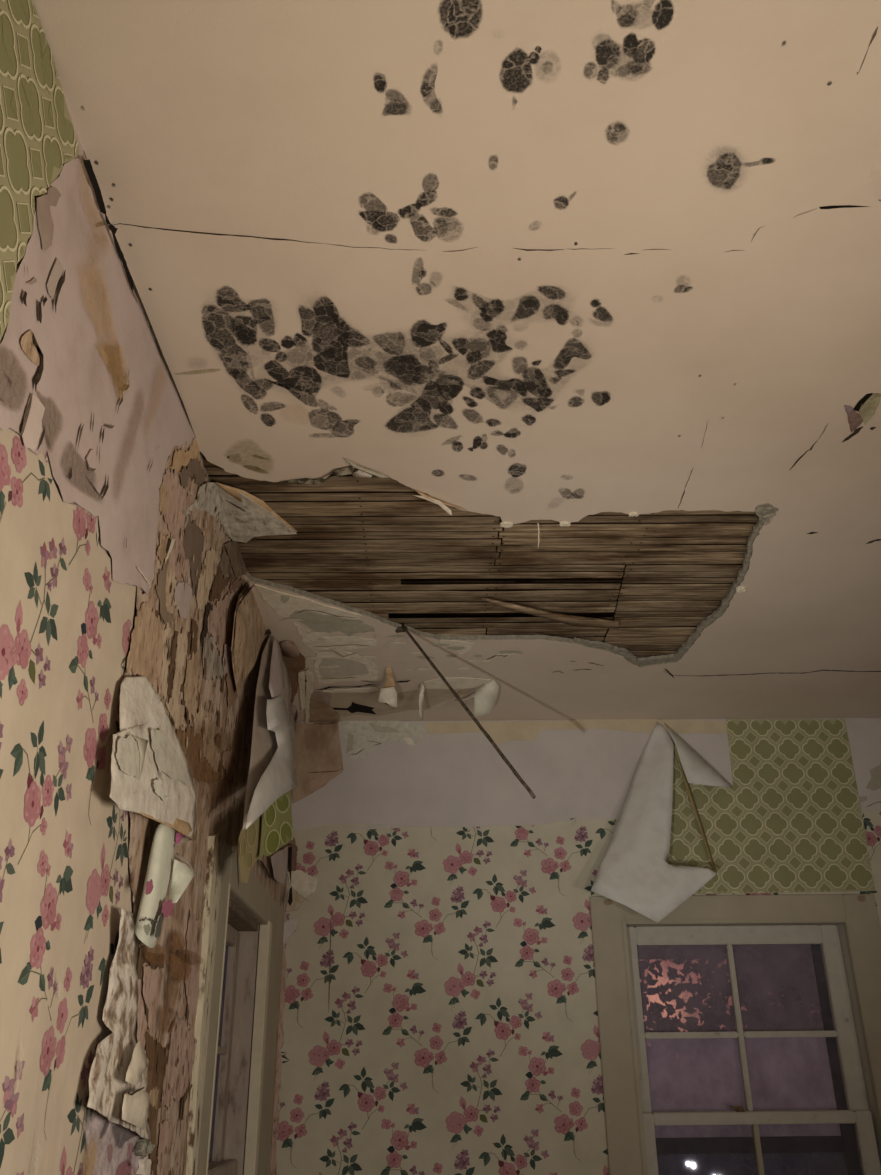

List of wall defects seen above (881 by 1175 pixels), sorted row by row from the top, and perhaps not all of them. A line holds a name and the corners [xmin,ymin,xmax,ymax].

water stain [501,47,541,104]
water stain [585,12,655,81]
crack [96,222,477,252]
water stain [360,176,456,243]
crack [514,247,669,255]
crack [795,205,870,217]
crack [0,267,129,500]
peeling [0,159,207,594]
water stain [194,286,591,477]
peeling [254,584,652,831]
peeling [668,719,733,786]
peeling [85,830,219,1175]